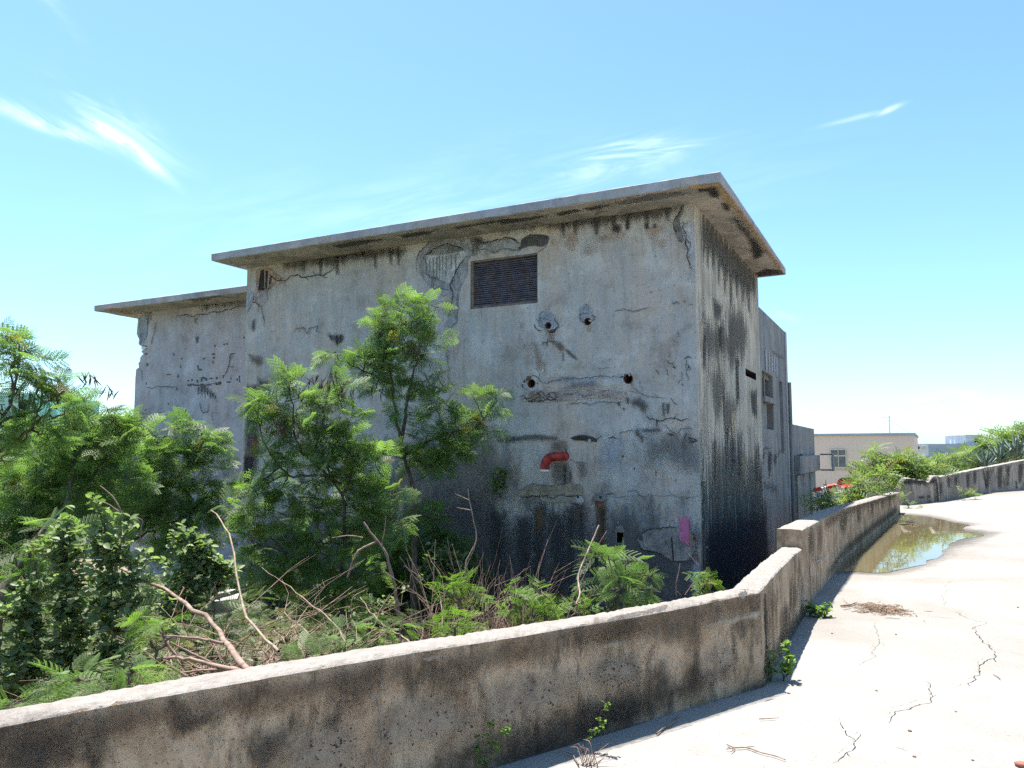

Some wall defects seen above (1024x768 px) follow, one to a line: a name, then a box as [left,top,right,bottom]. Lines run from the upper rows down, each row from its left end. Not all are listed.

crack [283,270,331,281]
flaking render [416,236,521,328]
damp [455,184,783,294]
crack [558,301,708,548]
damp [243,301,806,669]